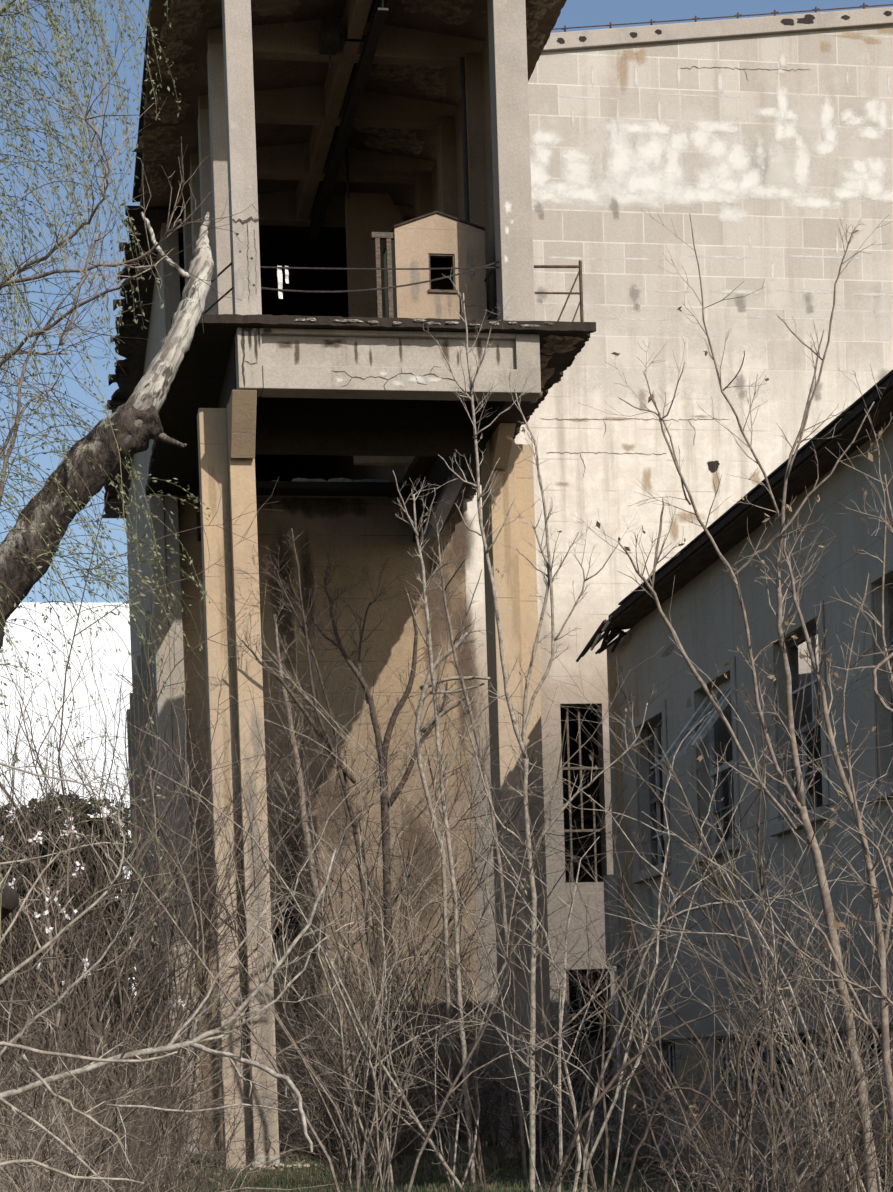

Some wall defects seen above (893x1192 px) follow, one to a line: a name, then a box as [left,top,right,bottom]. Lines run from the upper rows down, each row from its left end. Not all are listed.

peeling [146,0,206,79]
peeling [526,0,565,64]
spalling [781,14,815,25]
peeling [133,93,191,161]
damp [530,67,893,222]
crack [332,366,455,390]